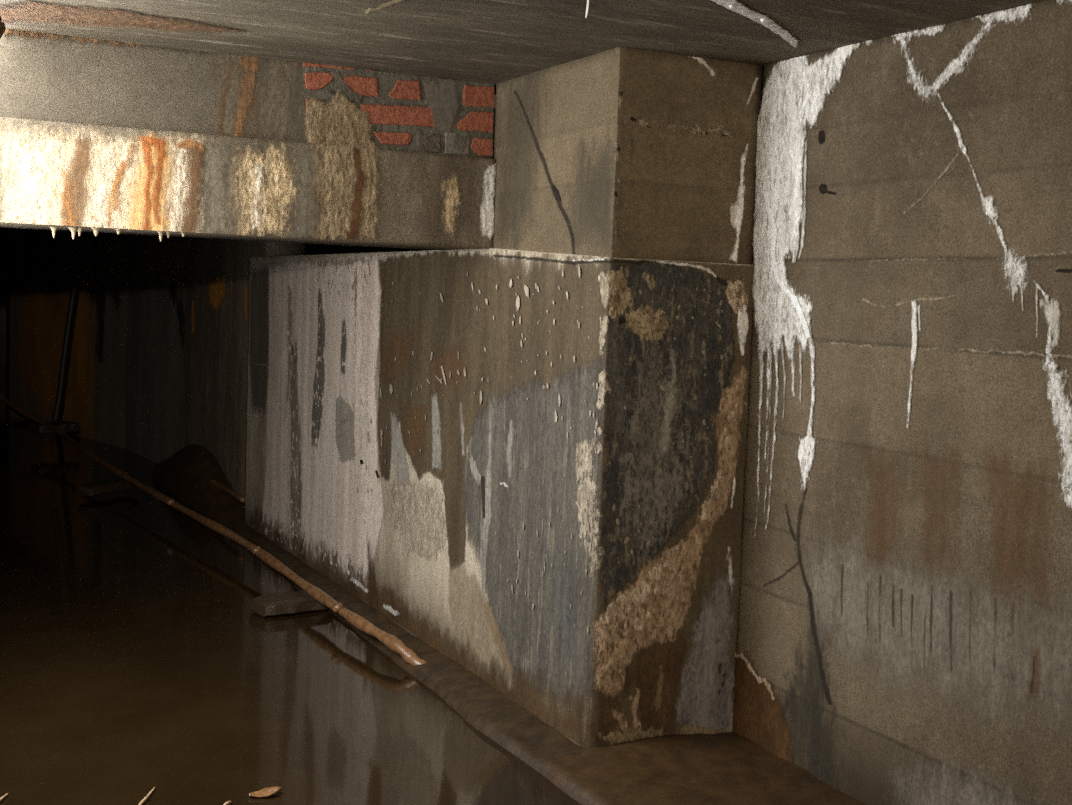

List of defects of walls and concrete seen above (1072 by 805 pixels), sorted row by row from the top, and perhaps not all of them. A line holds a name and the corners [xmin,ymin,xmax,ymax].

corrosion [60,138,92,226]
corrosion [108,135,205,233]
water stain [0,53,381,240]
corrosion [234,56,258,137]
flaking render [301,63,495,157]
crack [493,91,728,285]
crack [712,0,798,48]
water stain [892,4,1072,507]
water stain [249,40,871,749]
water stain [862,295,954,428]
peeling [460,252,736,732]
crack [764,488,831,704]